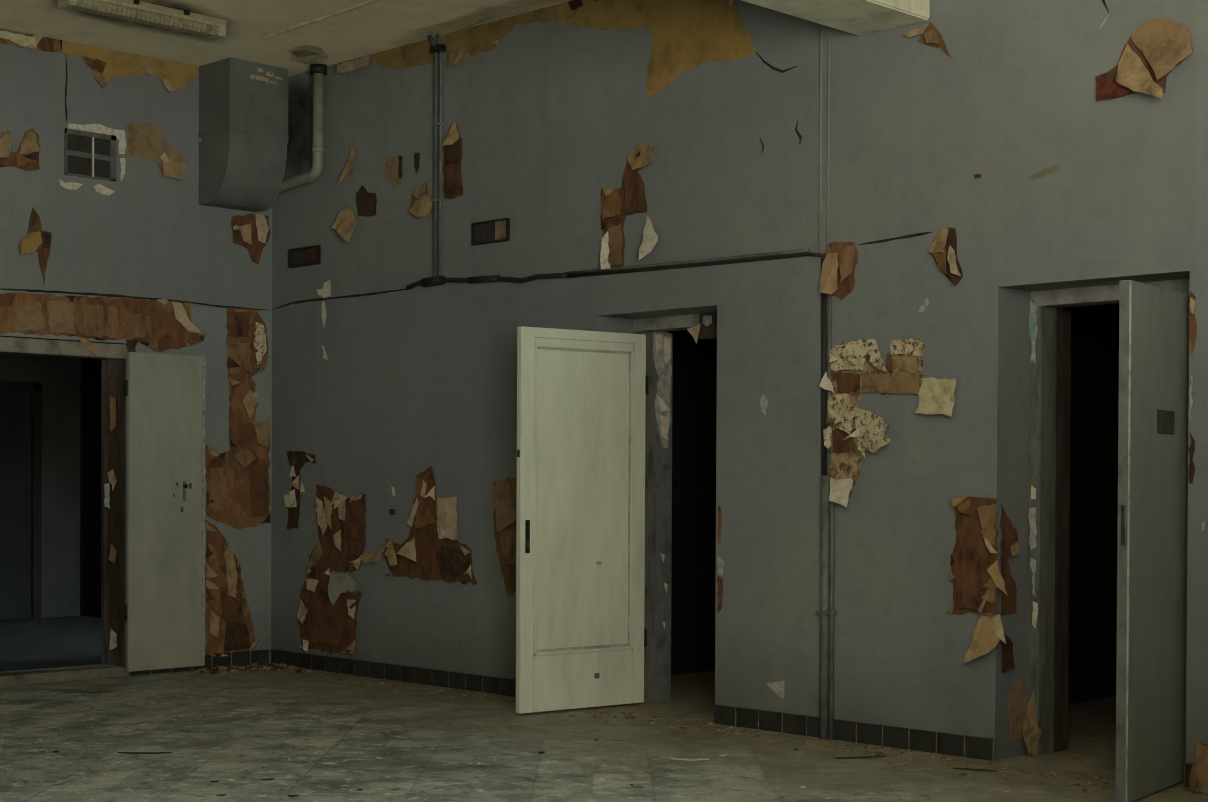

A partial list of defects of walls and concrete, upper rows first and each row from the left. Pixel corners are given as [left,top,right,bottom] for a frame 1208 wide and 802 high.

peeling [0,28,198,93]
peeling [332,0,756,100]
crack [756,52,797,73]
peeling [1095,17,1193,101]
peeling [59,122,188,196]
peeling [600,143,658,269]
peeling [0,208,206,357]
peeling [820,242,859,300]
peeling [819,338,956,507]
peeling [205,308,477,657]
peeling [492,477,517,595]
peeling [946,485,1042,755]